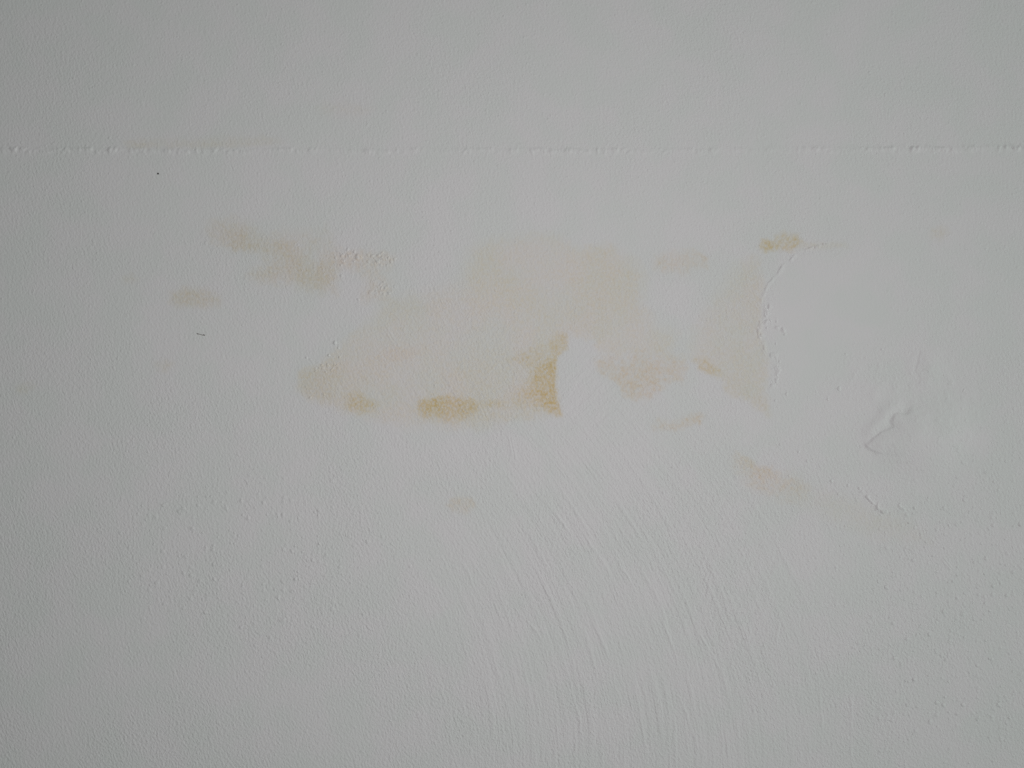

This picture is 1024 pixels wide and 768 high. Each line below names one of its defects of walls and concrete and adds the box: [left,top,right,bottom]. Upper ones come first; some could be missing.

leakage [199,210,711,437]